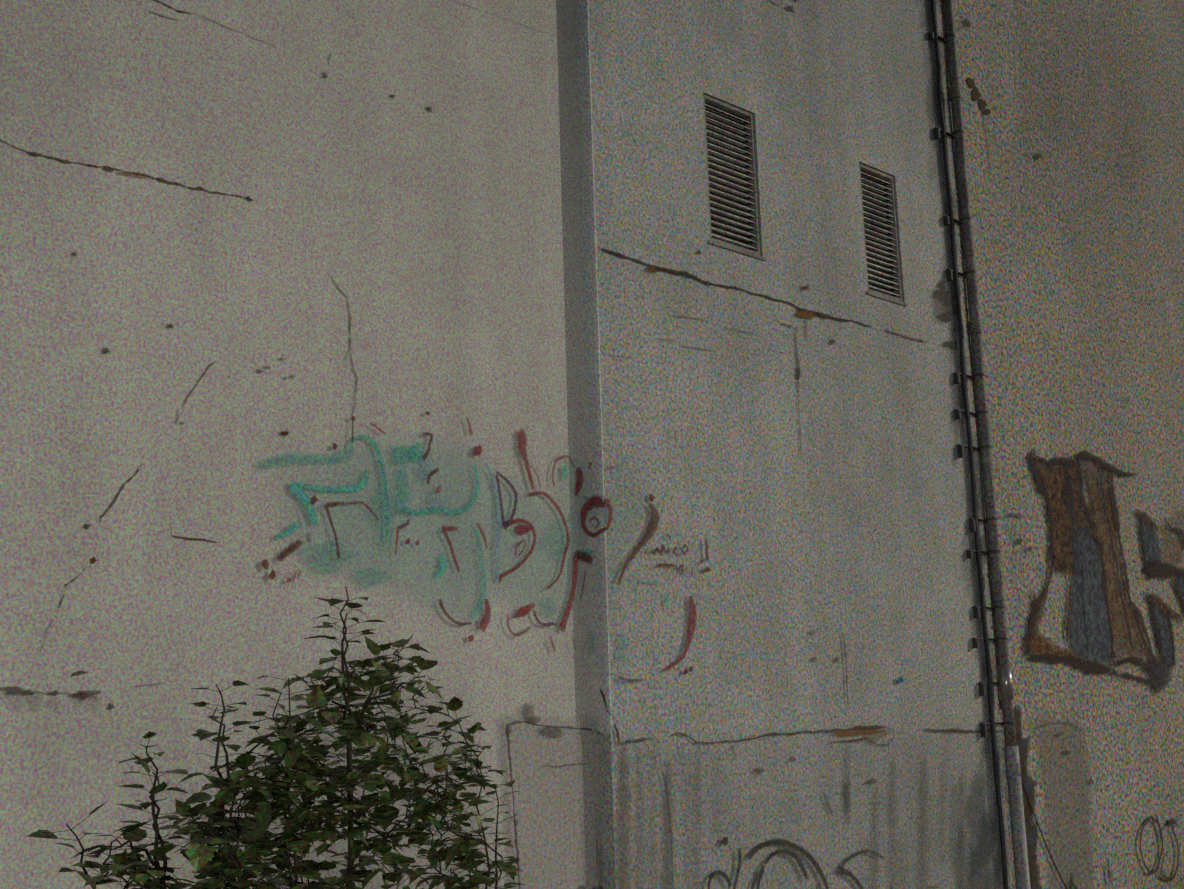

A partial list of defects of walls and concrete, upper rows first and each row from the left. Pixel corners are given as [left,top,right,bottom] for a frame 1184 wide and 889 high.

crack [149,0,190,20]
crack [770,0,797,13]
crack [0,139,254,201]
crack [328,273,358,416]
crack [601,248,927,457]
crack [600,635,895,754]
crack [926,726,1001,734]